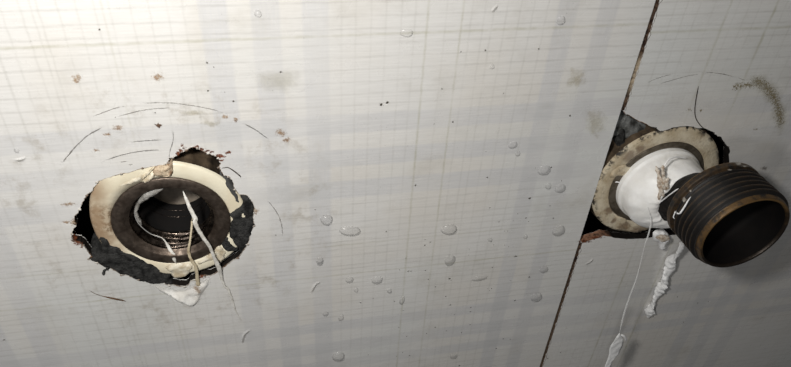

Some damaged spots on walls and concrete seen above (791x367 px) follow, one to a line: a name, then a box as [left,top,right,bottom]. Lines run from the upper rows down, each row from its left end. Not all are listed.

spalling [71,147,255,265]
spalling [165,237,250,288]